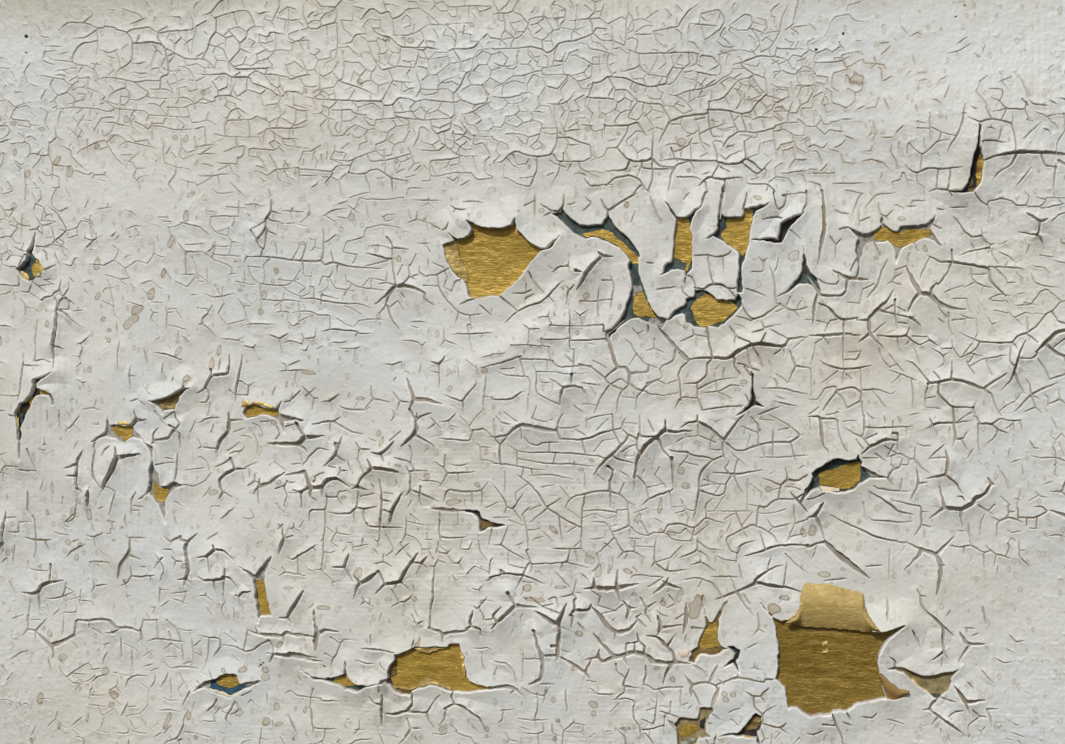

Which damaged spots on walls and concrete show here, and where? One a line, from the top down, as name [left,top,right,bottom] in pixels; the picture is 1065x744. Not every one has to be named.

peeling [436,179,830,351]
peeling [839,115,994,278]
peeling [8,363,62,470]
peeling [84,373,200,532]
crack [153,355,255,443]
peeling [236,393,314,442]
crack [185,219,1065,744]
peeling [792,446,896,511]
crack [0,399,390,744]
peeling [186,665,268,707]
peeling [291,636,523,705]
peeling [665,583,969,744]